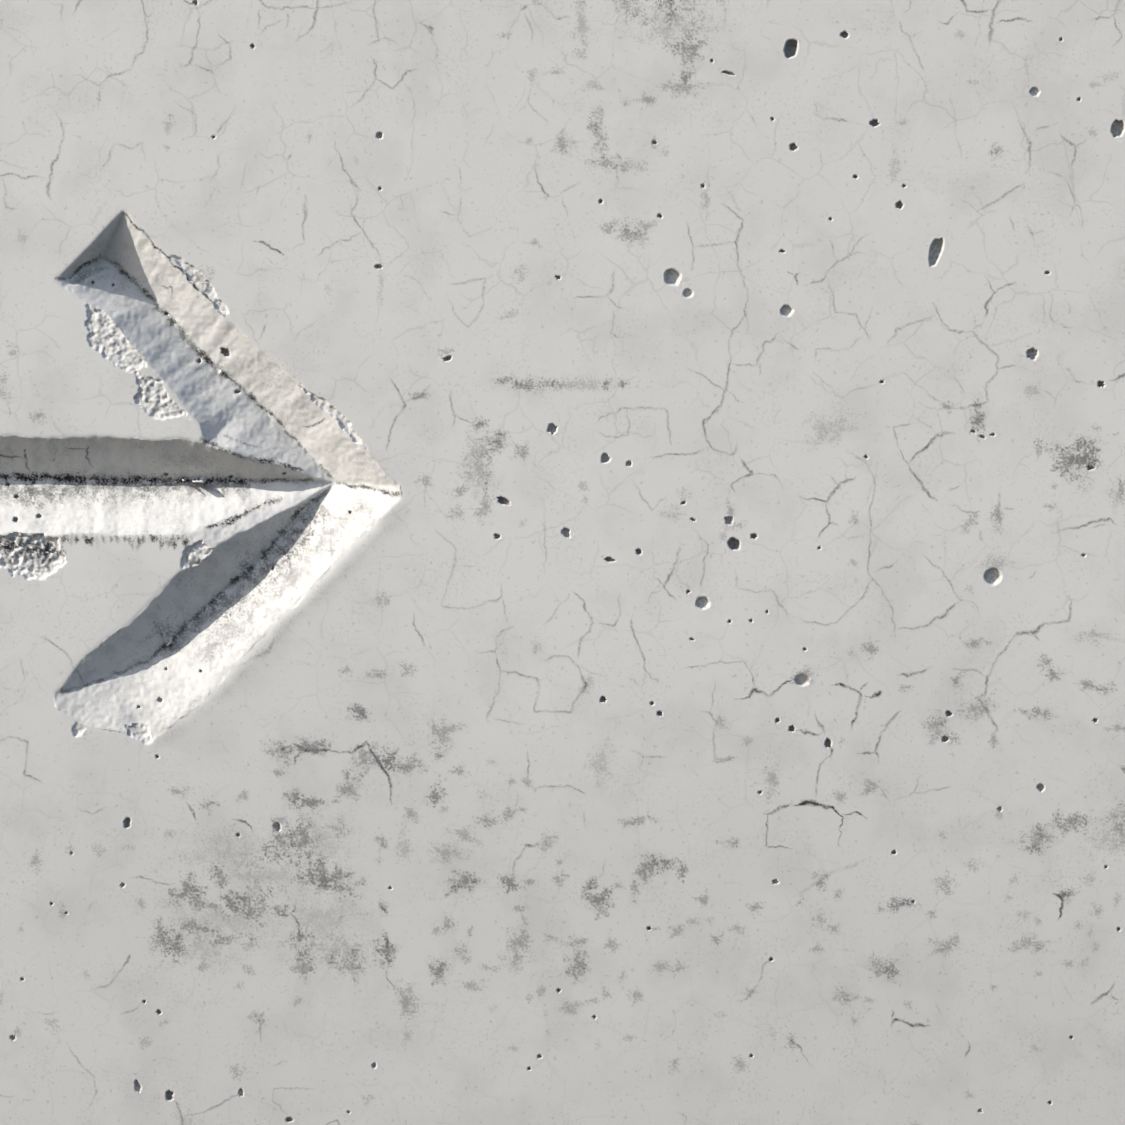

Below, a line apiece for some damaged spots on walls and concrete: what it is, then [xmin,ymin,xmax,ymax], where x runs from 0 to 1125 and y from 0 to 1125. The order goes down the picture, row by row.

leakage [281,739,330,753]
crack [784,732,861,832]
leakage [284,793,323,809]
leakage [169,873,207,901]
leakage [297,858,352,895]
leakage [583,879,613,916]
leakage [638,859,686,882]